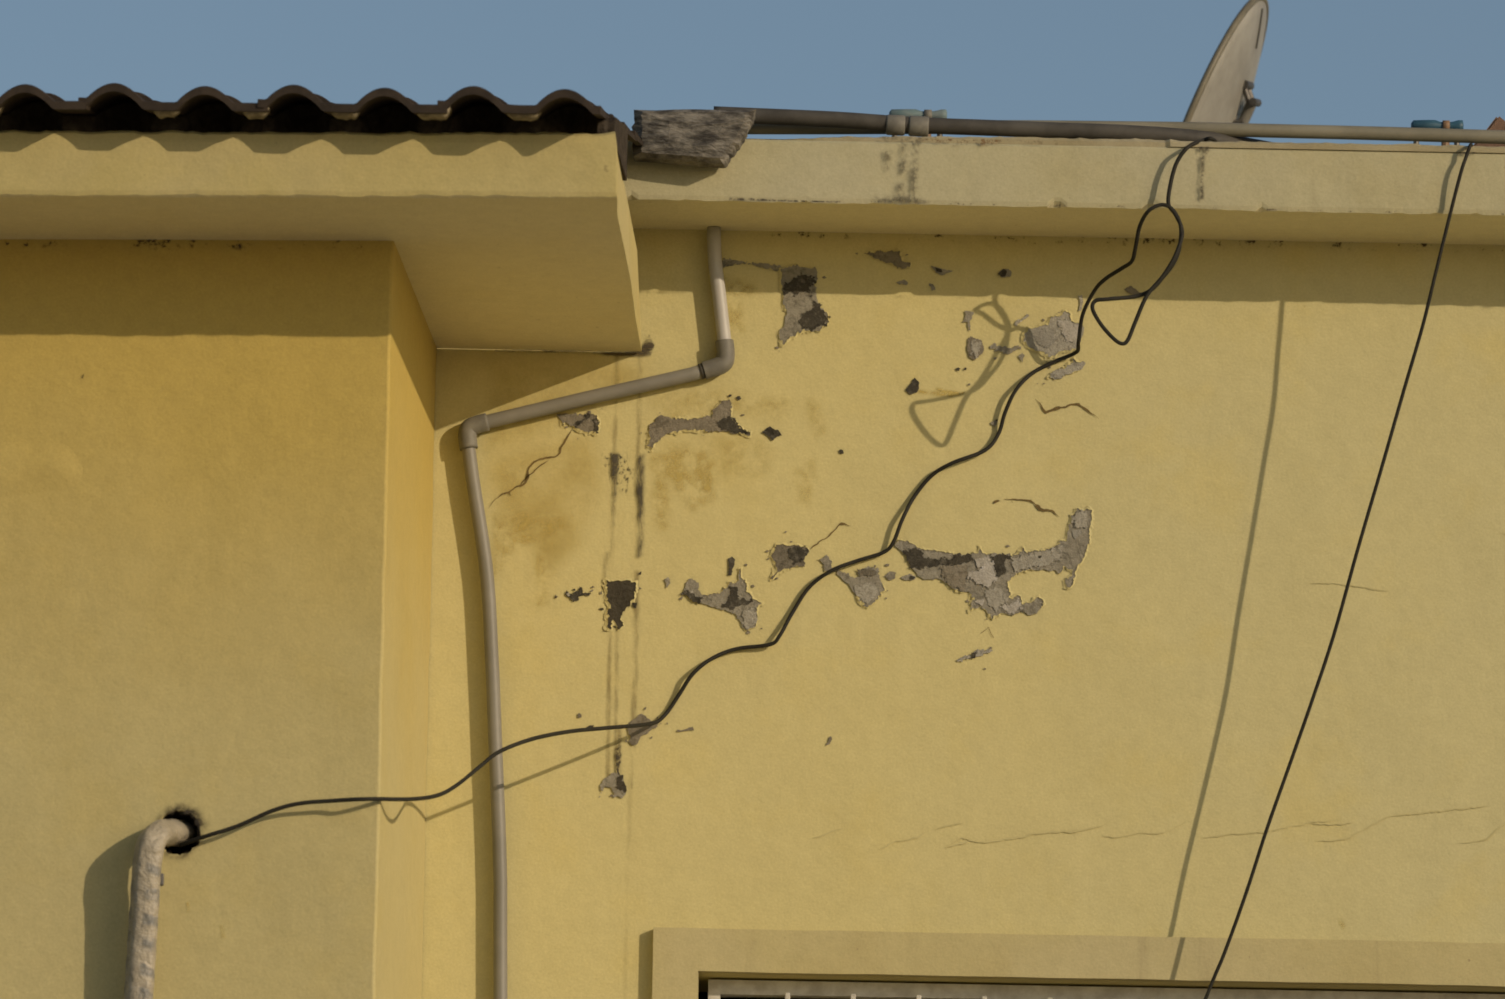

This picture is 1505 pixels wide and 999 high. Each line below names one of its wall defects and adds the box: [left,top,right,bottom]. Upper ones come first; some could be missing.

peeling [722,258,831,349]
peeling [956,295,1086,386]
peeling [641,394,782,452]
crack [1035,399,1099,419]
crack [490,430,572,506]
crack [994,499,1059,517]
peeling [664,505,1095,634]
peeling [555,572,642,632]
peeling [625,707,694,746]
peeling [599,768,627,798]
crack [881,805,1505,849]